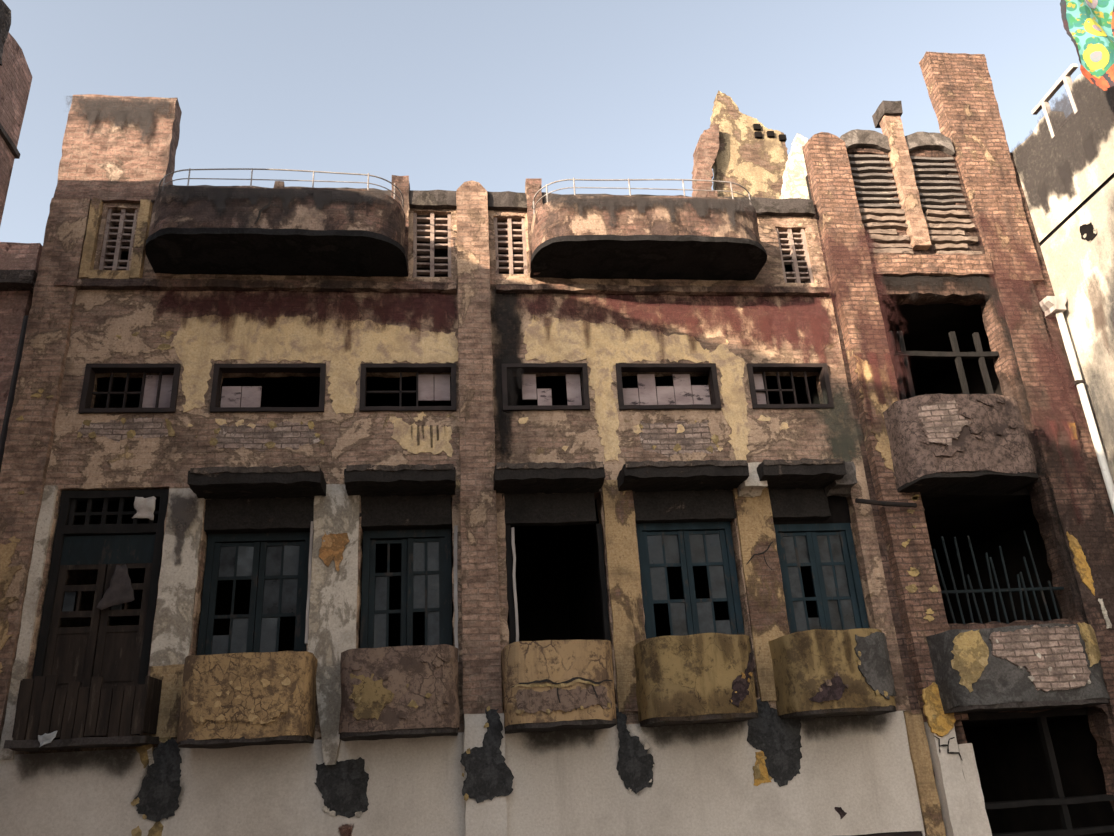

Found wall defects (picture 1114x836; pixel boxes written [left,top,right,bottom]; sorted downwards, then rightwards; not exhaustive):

damp [1012,76,1114,213]
damp [158,280,458,348]
damp [519,229,885,363]
flaking render [853,355,898,479]
damp [858,307,902,422]
damp [1031,335,1114,523]
damp [1088,275,1114,351]
flaking render [951,531,1112,693]
spalling [131,737,182,836]
spalling [315,757,370,818]
spalling [460,706,514,803]
spalling [729,653,802,787]